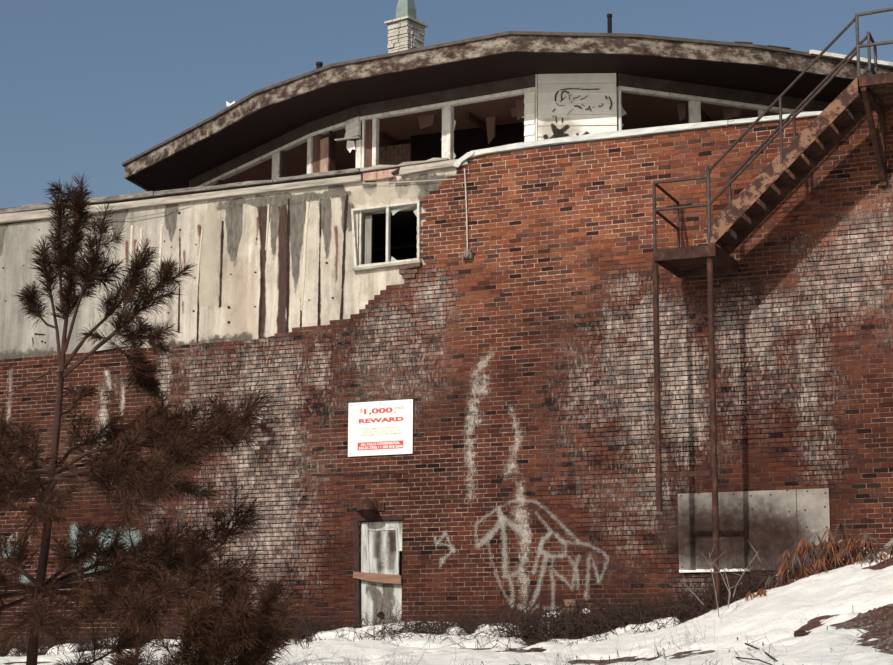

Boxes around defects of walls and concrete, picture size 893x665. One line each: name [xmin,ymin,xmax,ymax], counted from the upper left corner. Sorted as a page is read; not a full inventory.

efflorescence [97,371,111,447]
damp [158,184,354,578]
efflorescence [354,309,430,389]
efflorescence [415,274,454,324]
efflorescence [467,356,489,465]
efflorescence [570,295,707,508]
efflorescence [714,216,893,369]
efflorescence [799,339,823,413]